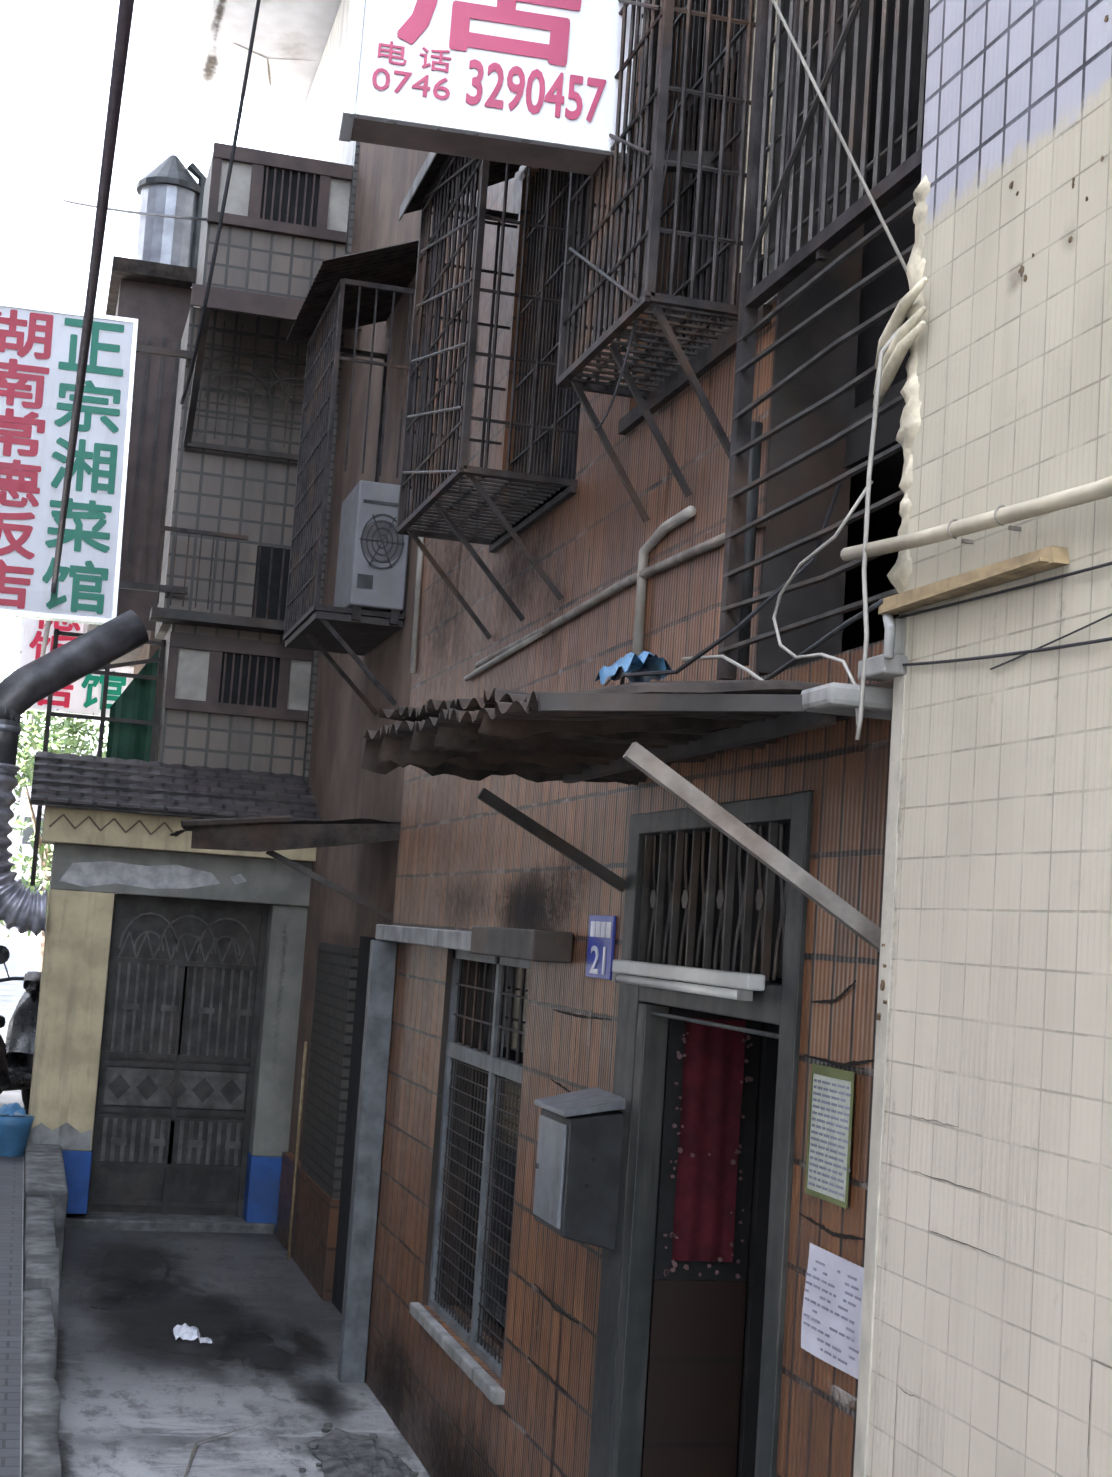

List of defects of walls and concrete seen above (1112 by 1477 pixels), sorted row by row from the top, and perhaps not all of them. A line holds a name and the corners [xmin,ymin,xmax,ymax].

crack [909,1114,957,1127]
crack [914,1171,990,1195]
crack [928,1230,999,1257]
crack [892,1349,919,1477]
crack [1087,1360,1112,1456]